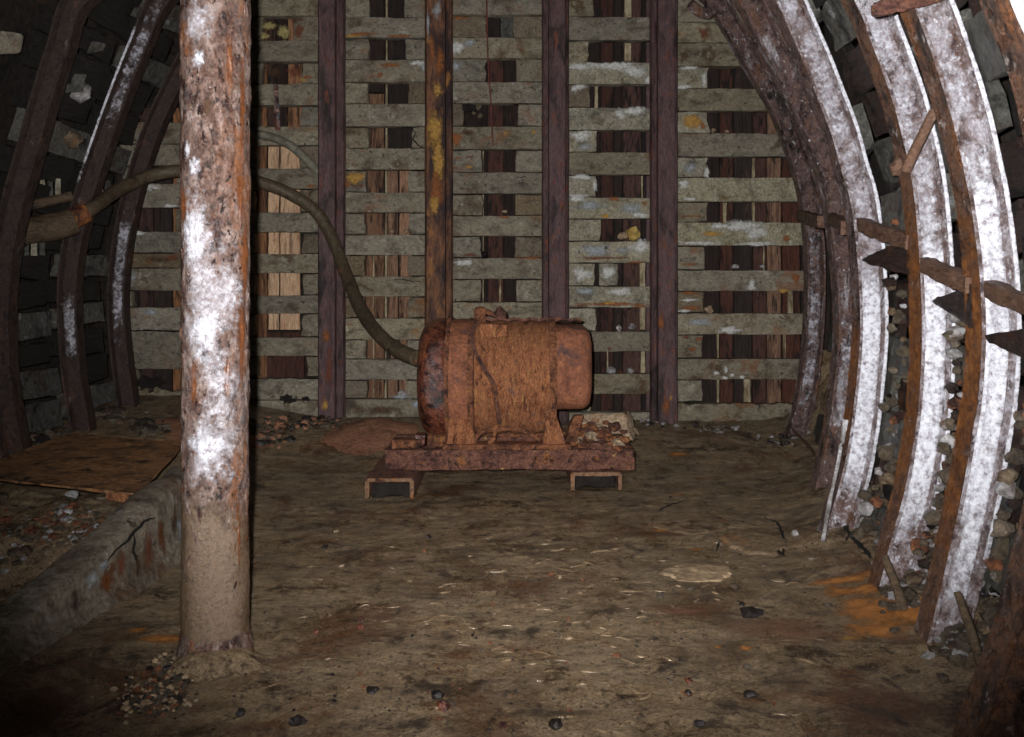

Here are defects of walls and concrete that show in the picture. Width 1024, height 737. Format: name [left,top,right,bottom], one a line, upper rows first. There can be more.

water stain [113,222,144,327]
crack [107,517,155,575]
rust [101,508,176,591]
water stain [783,0,871,216]
water stain [833,234,881,495]
water stain [865,0,944,262]
rust [895,213,921,473]
water stain [898,274,946,537]
rust [944,242,981,518]
water stain [948,298,1009,599]
water stain [965,155,1006,282]
water stain [1010,0,1024,33]